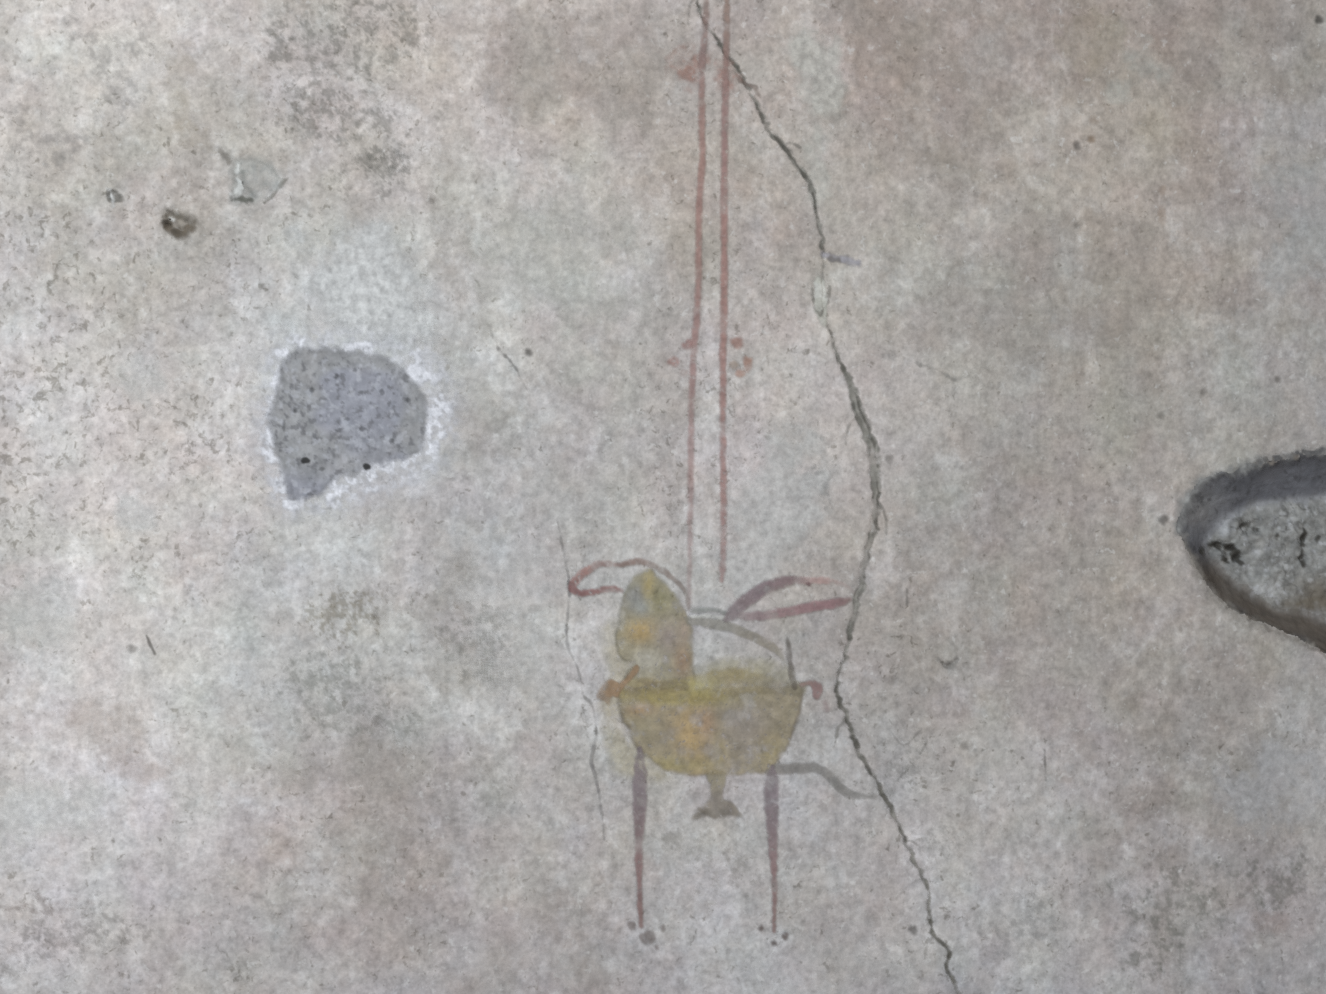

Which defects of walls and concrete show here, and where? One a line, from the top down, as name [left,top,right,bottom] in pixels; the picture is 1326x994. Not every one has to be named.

crack [698,6,880,543]
flaking render [1176,448,1326,653]
crack [835,580,955,983]